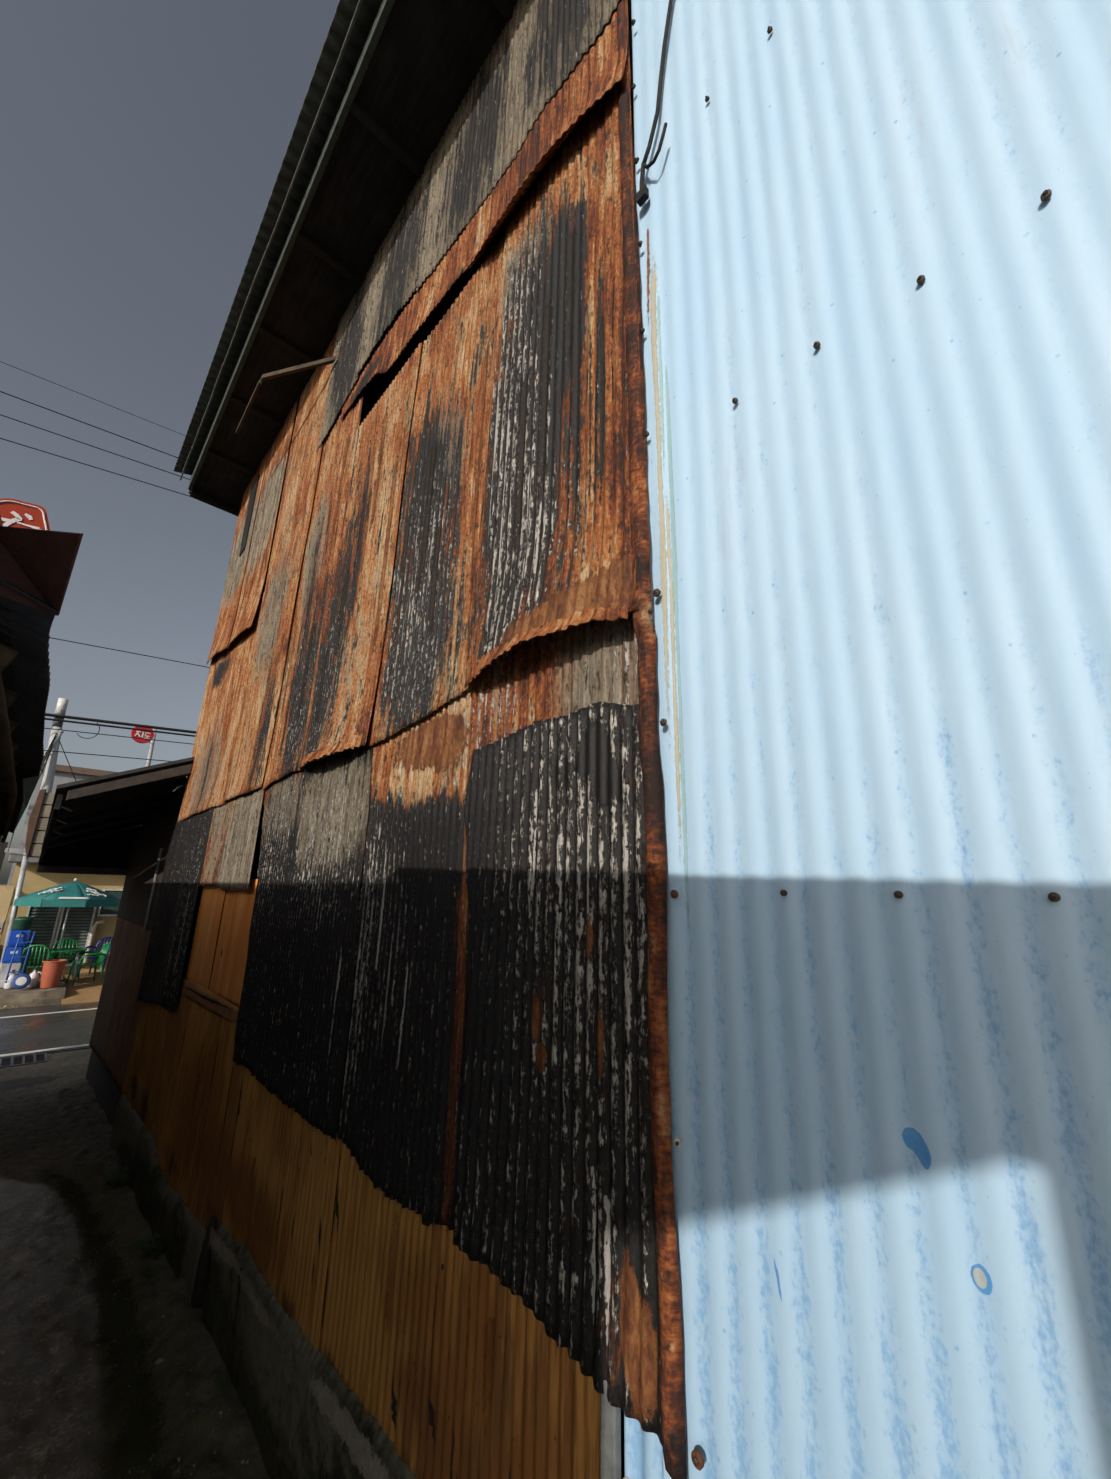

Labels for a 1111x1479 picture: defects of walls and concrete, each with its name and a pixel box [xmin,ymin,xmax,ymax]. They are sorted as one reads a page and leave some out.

rust [323,430,350,593]
rust [368,407,398,653]
rust [469,342,489,582]
rust [647,229,681,827]
rust [390,713,470,777]
peeling [530,790,538,916]
peeling [327,955,342,1065]
peeling [350,874,408,1069]
peeling [589,1166,612,1345]
rust [619,1248,658,1422]